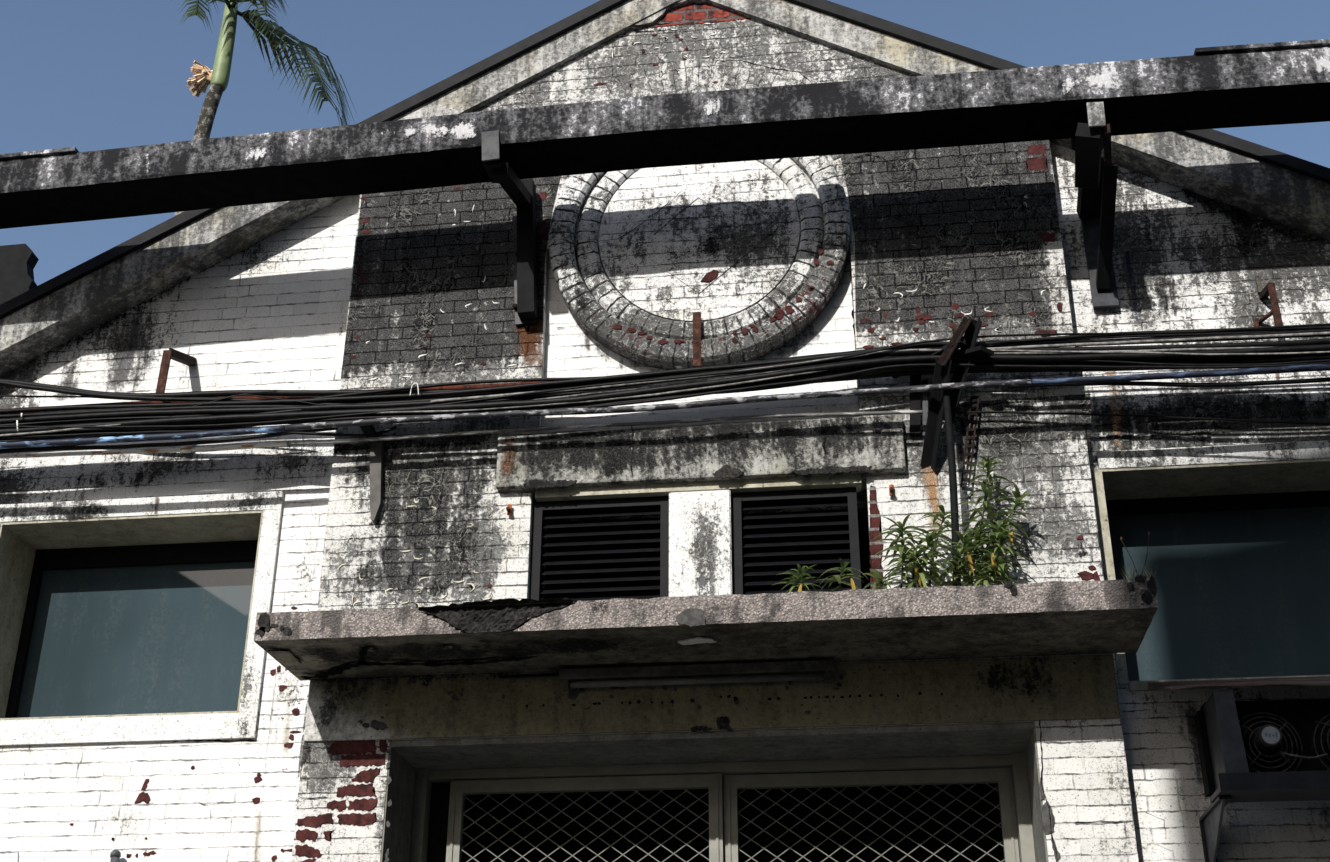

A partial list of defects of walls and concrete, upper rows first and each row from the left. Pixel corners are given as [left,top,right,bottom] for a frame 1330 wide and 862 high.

spalling [631,0,752,92]
water stain [1181,188,1330,257]
water stain [1149,269,1185,318]
water stain [516,410,890,477]
water stain [954,391,1330,457]
water stain [334,434,498,605]
corrosion [923,468,941,529]
spalling [385,570,575,634]
spalling [271,676,392,862]